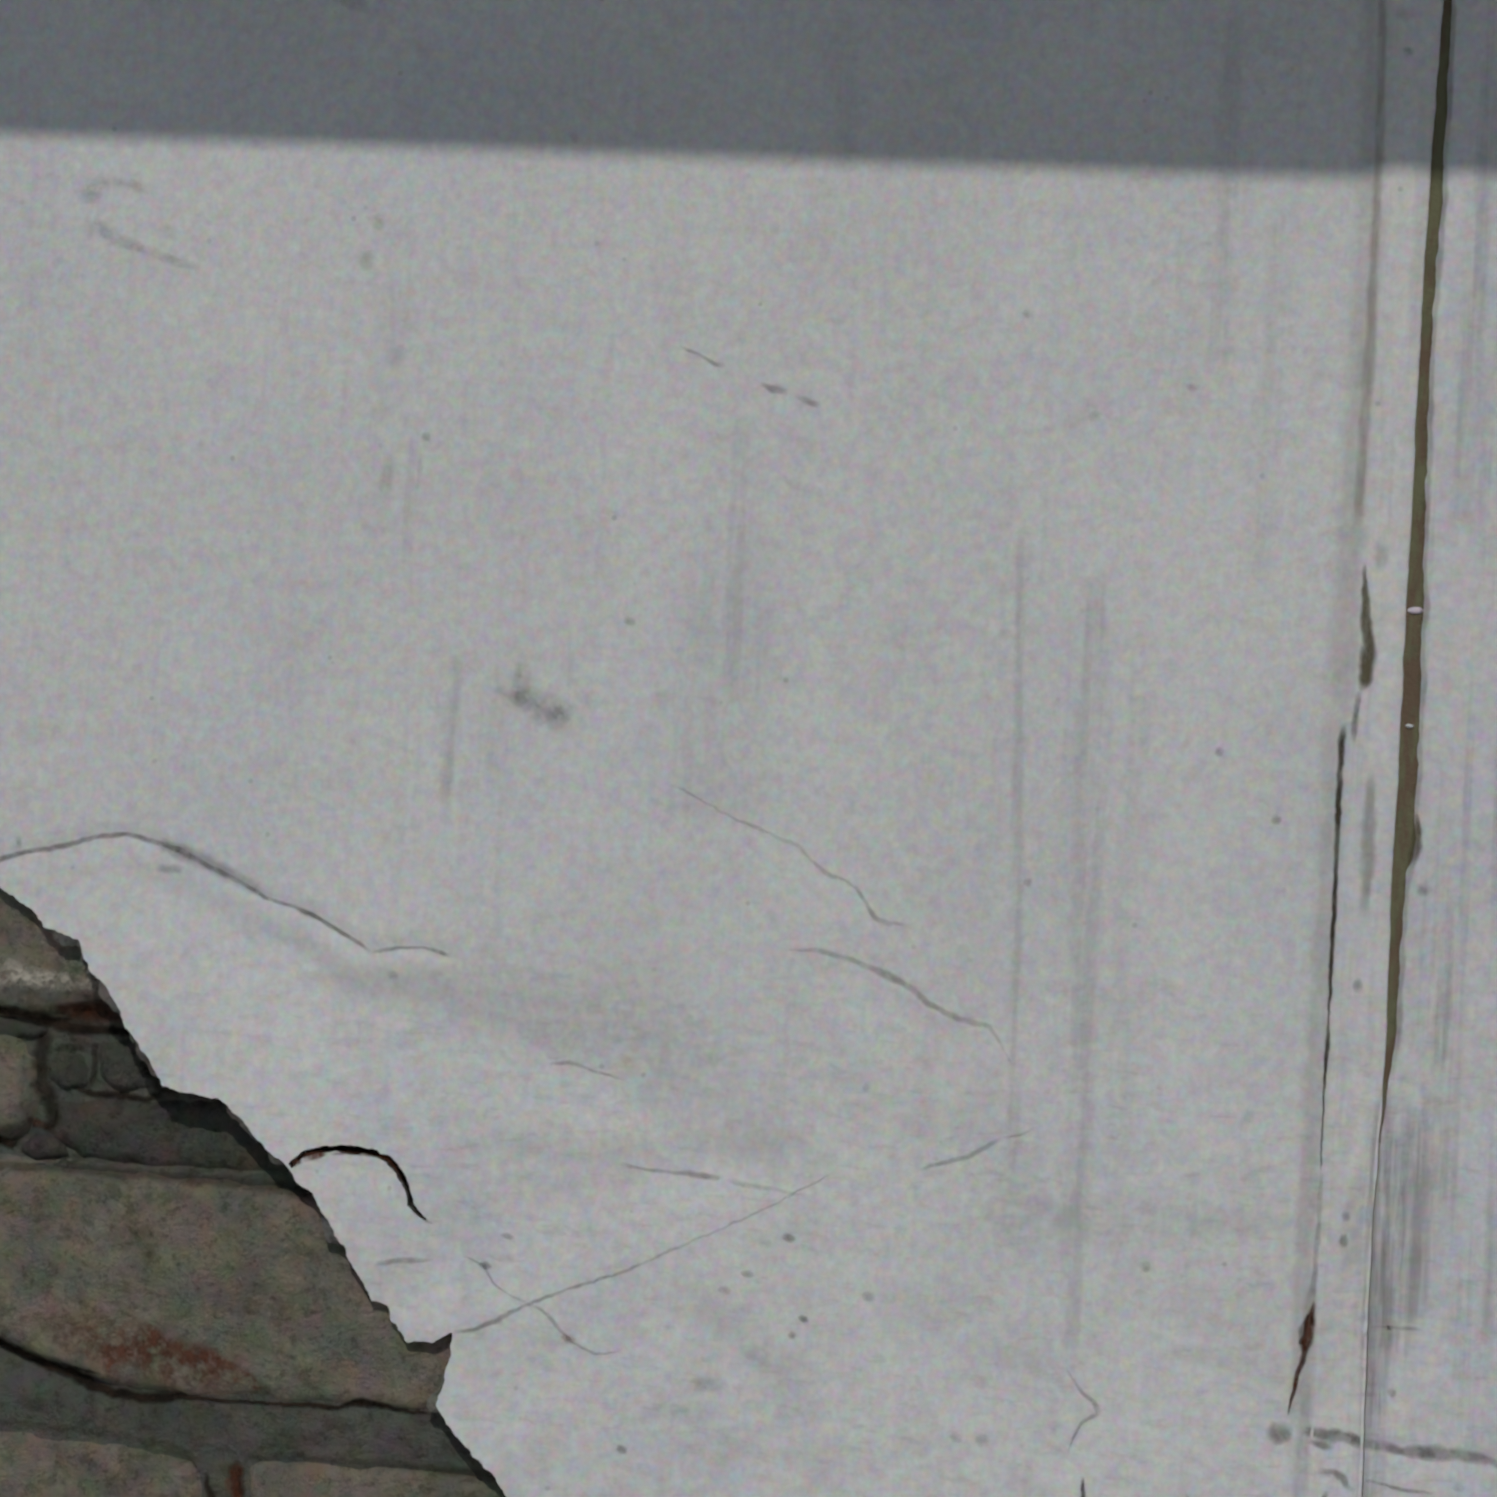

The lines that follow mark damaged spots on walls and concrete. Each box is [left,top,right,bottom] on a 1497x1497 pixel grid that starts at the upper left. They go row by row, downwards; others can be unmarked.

spalling [0,888,506,1497]
crack [287,1145,426,1220]
crack [1388,1445,1435,1457]